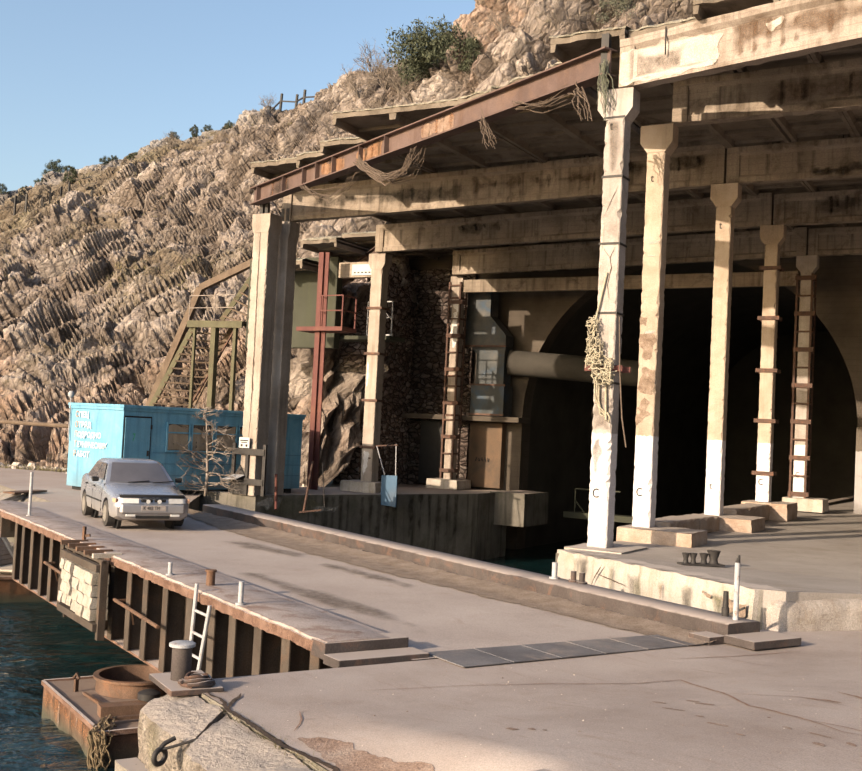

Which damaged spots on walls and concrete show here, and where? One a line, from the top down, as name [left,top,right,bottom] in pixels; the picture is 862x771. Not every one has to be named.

rust [421,114,454,138]
rust [321,158,345,175]
rust [356,141,382,163]
peeling [635,317,656,425]
crack [538,680,862,735]
crack [207,691,339,771]
spalling [297,737,434,771]